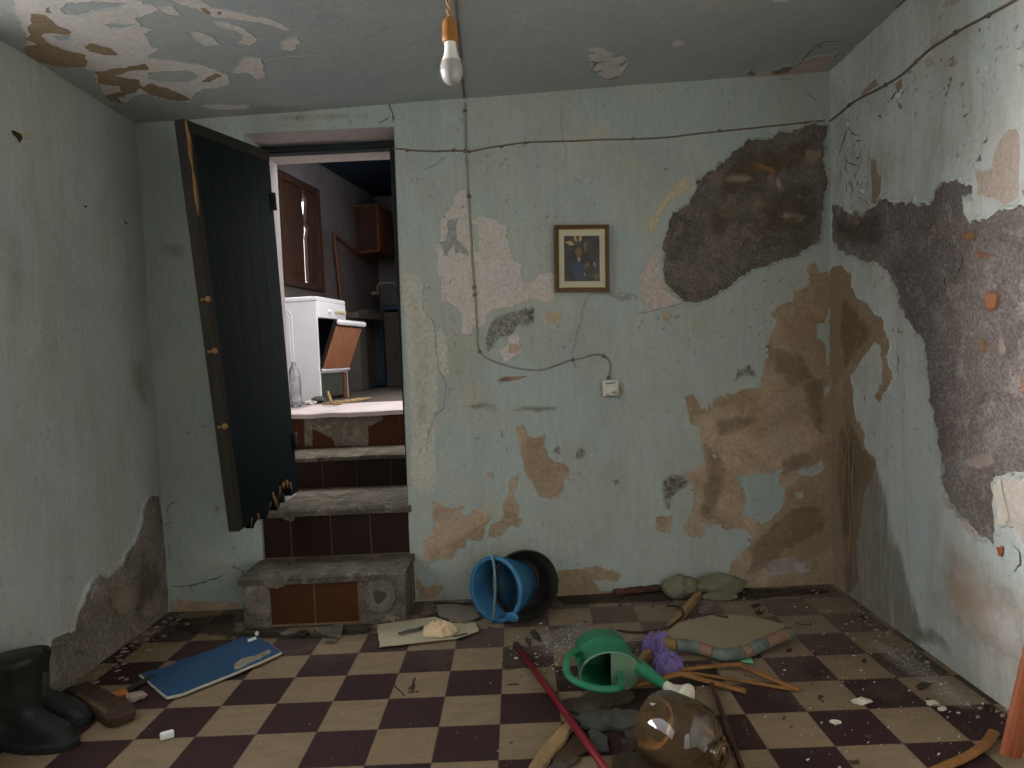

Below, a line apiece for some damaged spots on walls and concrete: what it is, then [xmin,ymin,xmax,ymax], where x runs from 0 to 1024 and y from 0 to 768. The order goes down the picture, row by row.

peeling [11,0,302,110]
peeling [586,46,632,81]
peeling [435,189,562,336]
crack [418,289,449,457]
peeling [498,332,522,362]
spalling [655,119,1024,596]
peeling [422,424,570,563]
spalling [45,491,241,692]
peeling [556,564,622,596]